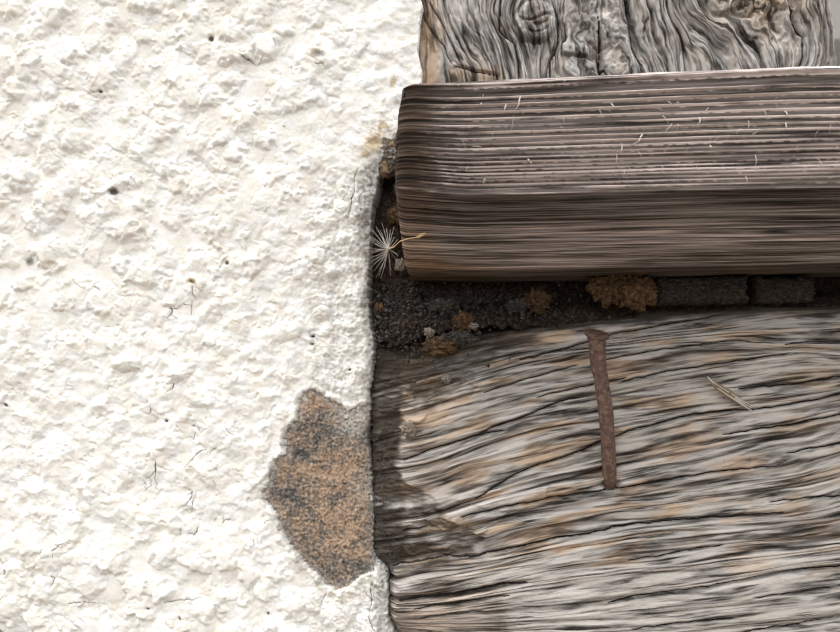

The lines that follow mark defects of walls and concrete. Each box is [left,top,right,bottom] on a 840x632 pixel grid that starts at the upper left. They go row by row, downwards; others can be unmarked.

spalling [259,390,377,590]